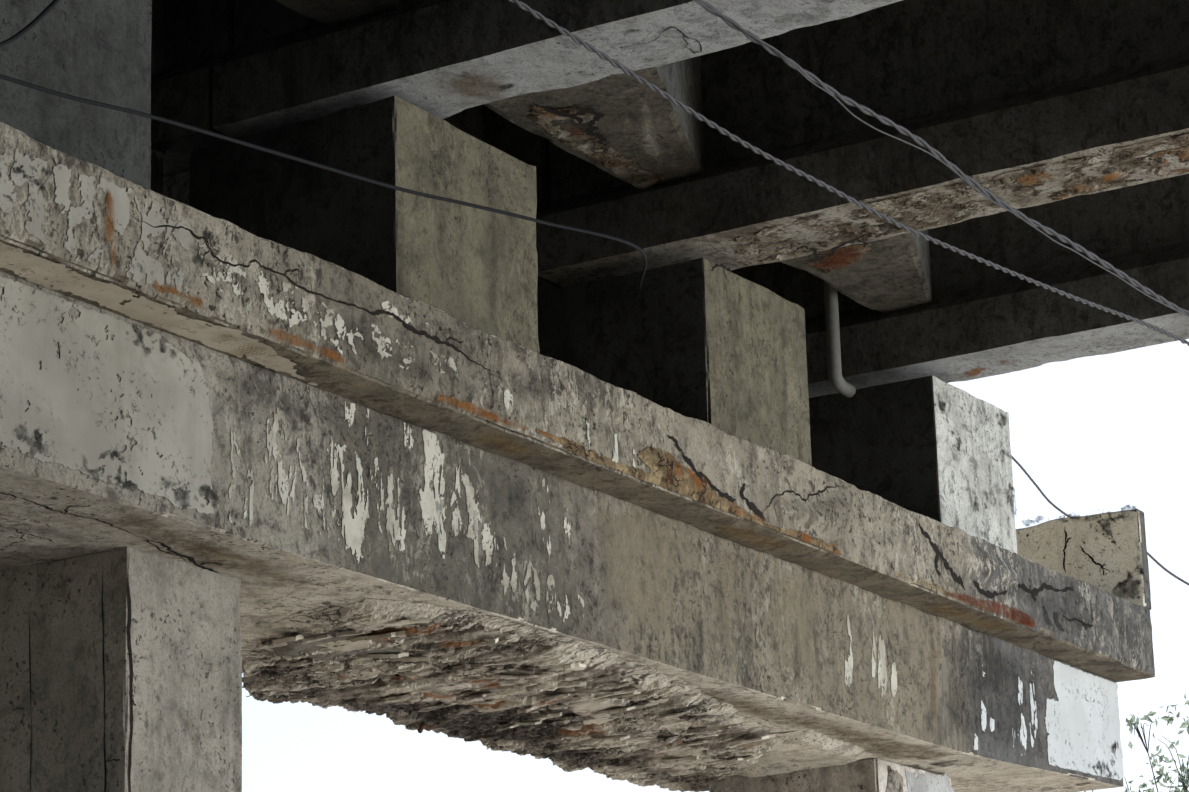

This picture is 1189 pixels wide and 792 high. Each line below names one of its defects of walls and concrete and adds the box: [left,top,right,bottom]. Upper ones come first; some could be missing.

peeling [0,148,413,563]
crack [131,215,494,408]
peeling [382,301,433,332]
crack [0,493,231,792]
peeling [404,423,584,622]
spalling [242,598,776,792]
spalling [536,420,852,558]
crack [668,435,845,522]
peeling [845,615,853,687]
peeling [872,631,897,697]
corrosion [946,592,1035,627]
crack [919,524,1110,630]